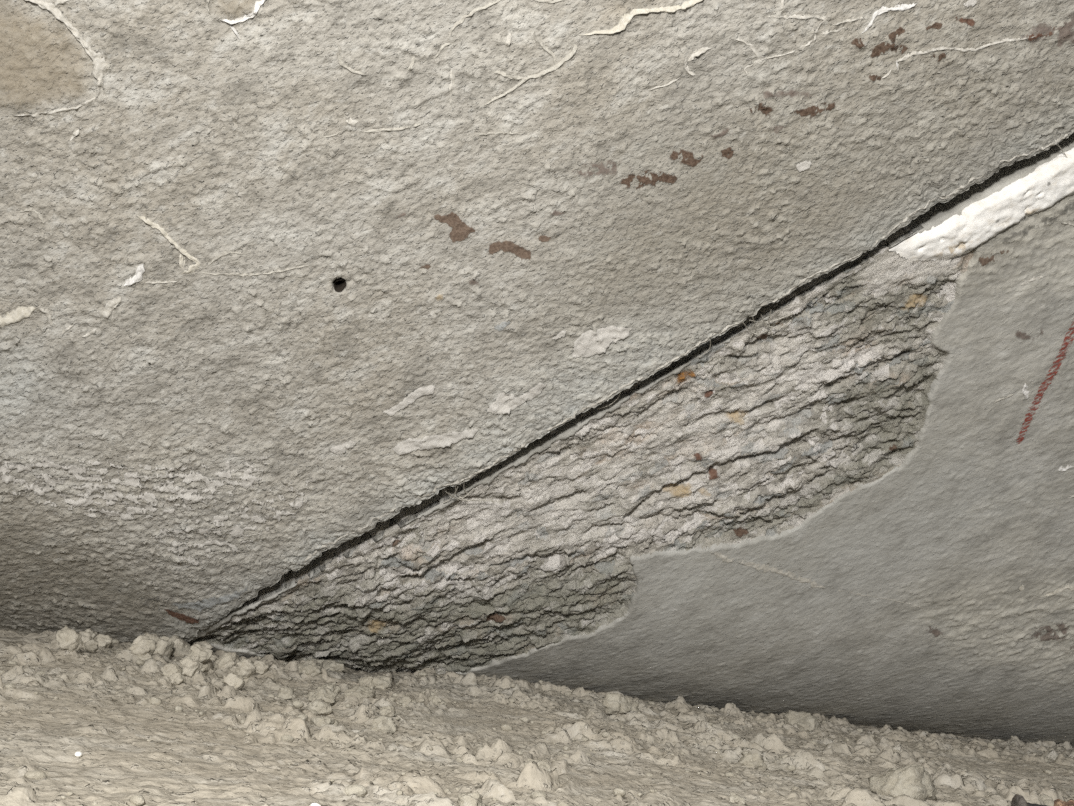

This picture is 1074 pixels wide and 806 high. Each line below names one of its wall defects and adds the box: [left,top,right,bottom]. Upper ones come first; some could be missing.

crack [408,0,501,106]
crack [479,0,703,135]
crack [736,0,917,77]
corrosion [851,27,908,58]
crack [881,35,1036,79]
corrosion [577,162,677,189]
corrosion [670,150,703,167]
crack [137,215,309,277]
corrosion [434,212,475,242]
corrosion [489,241,531,260]
spalling [172,219,974,674]
peeling [0,455,317,566]